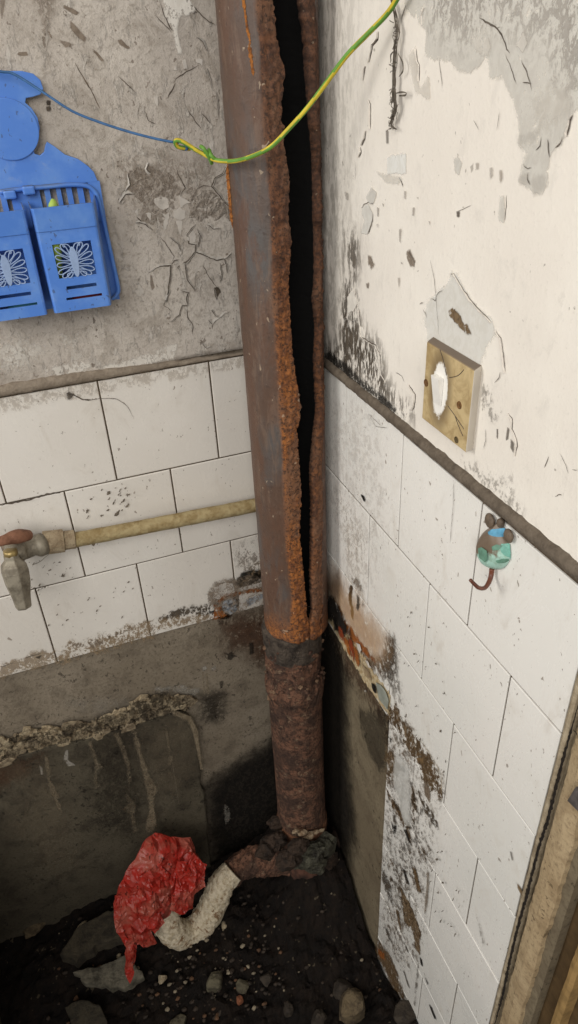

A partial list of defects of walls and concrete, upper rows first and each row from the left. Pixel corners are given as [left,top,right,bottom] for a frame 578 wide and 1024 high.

rust [242,0,254,75]
peeling [401,0,578,194]
crack [177,165,228,206]
crack [137,217,231,349]
mould [325,239,404,416]
peeling [449,308,471,334]
peeling [214,582,263,615]
rust [223,615,265,659]
rust [336,603,372,659]
spalling [0,692,203,770]
efflorescence [113,730,157,833]
damp [375,703,444,1006]